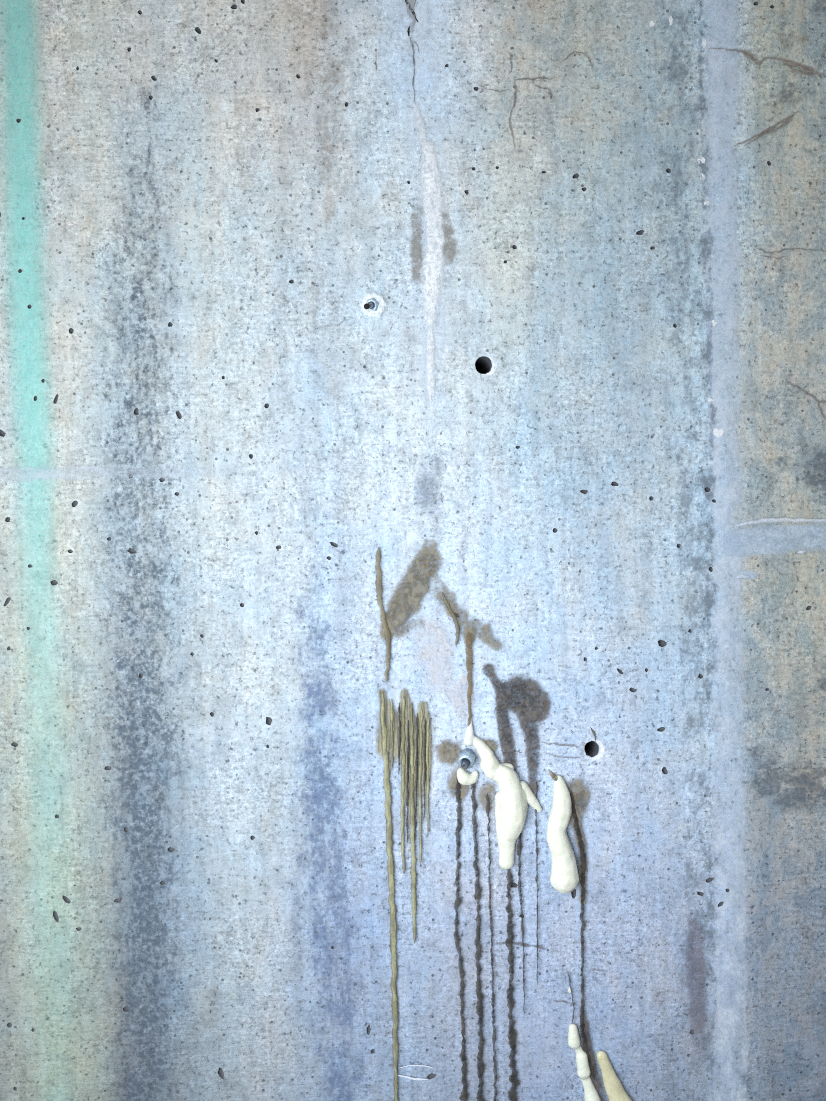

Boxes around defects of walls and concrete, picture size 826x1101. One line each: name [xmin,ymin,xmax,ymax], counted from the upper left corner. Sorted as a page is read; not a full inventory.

crack [405,0,419,101]
damp [375,541,550,1101]
damp [567,779,605,1097]